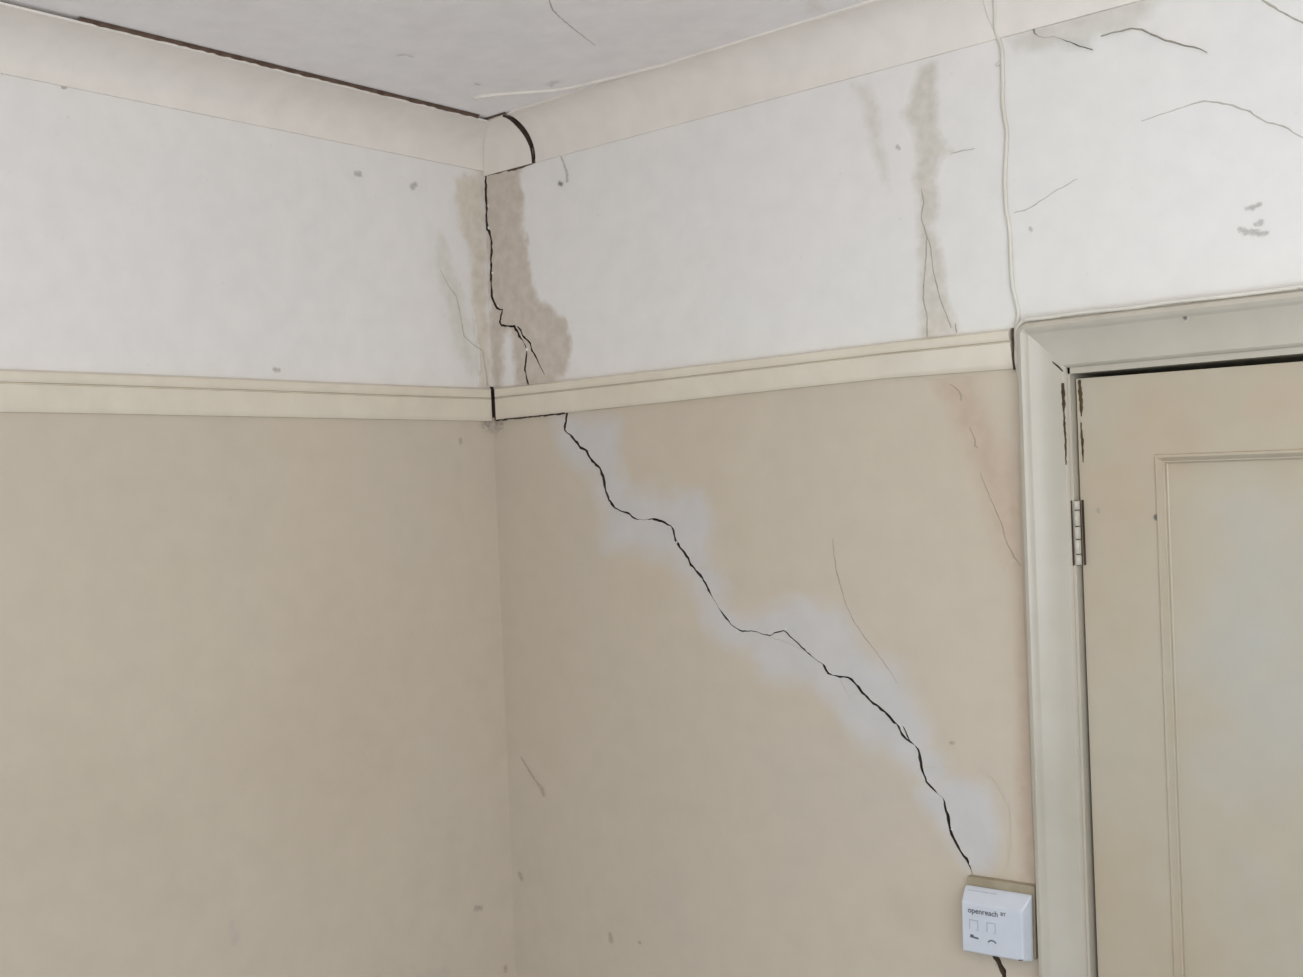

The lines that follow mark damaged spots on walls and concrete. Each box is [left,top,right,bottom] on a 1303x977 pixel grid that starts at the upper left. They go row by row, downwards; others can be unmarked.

water stain [430,167,576,388]
crack [549,0,595,45]
water stain [846,55,965,340]
crack [1033,28,1207,53]
crack [1142,100,1303,138]
crack [1262,0,1303,24]
crack [78,17,973,875]
crack [949,384,1021,566]
water stain [923,375,1035,884]
crack [993,956,1006,977]